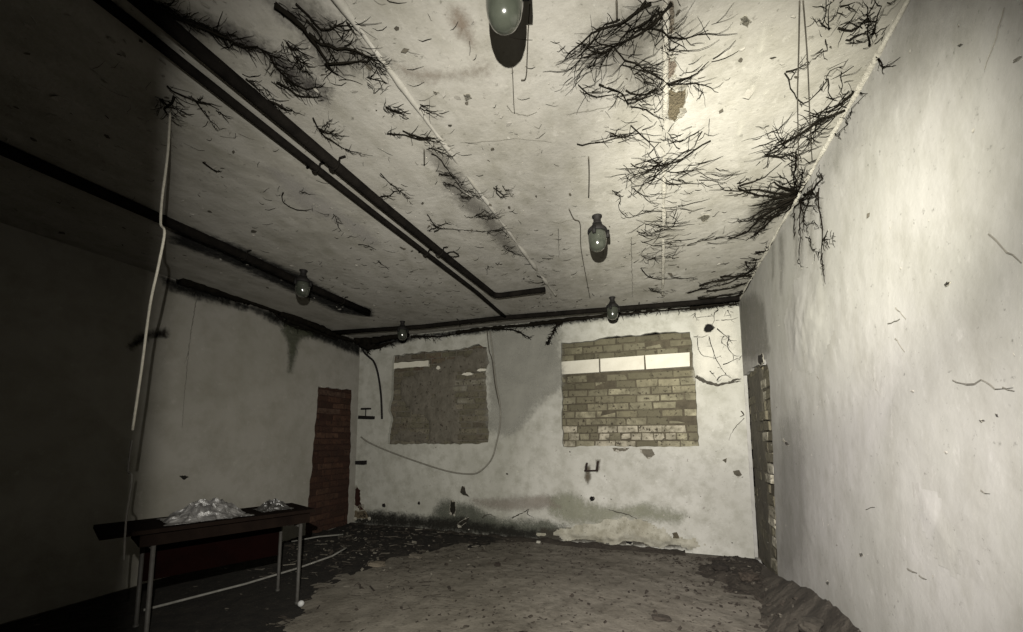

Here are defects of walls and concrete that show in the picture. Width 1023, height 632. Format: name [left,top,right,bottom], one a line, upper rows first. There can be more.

spalling [662,47,688,129]
crack [695,375,740,386]
water stain [355,502,647,545]